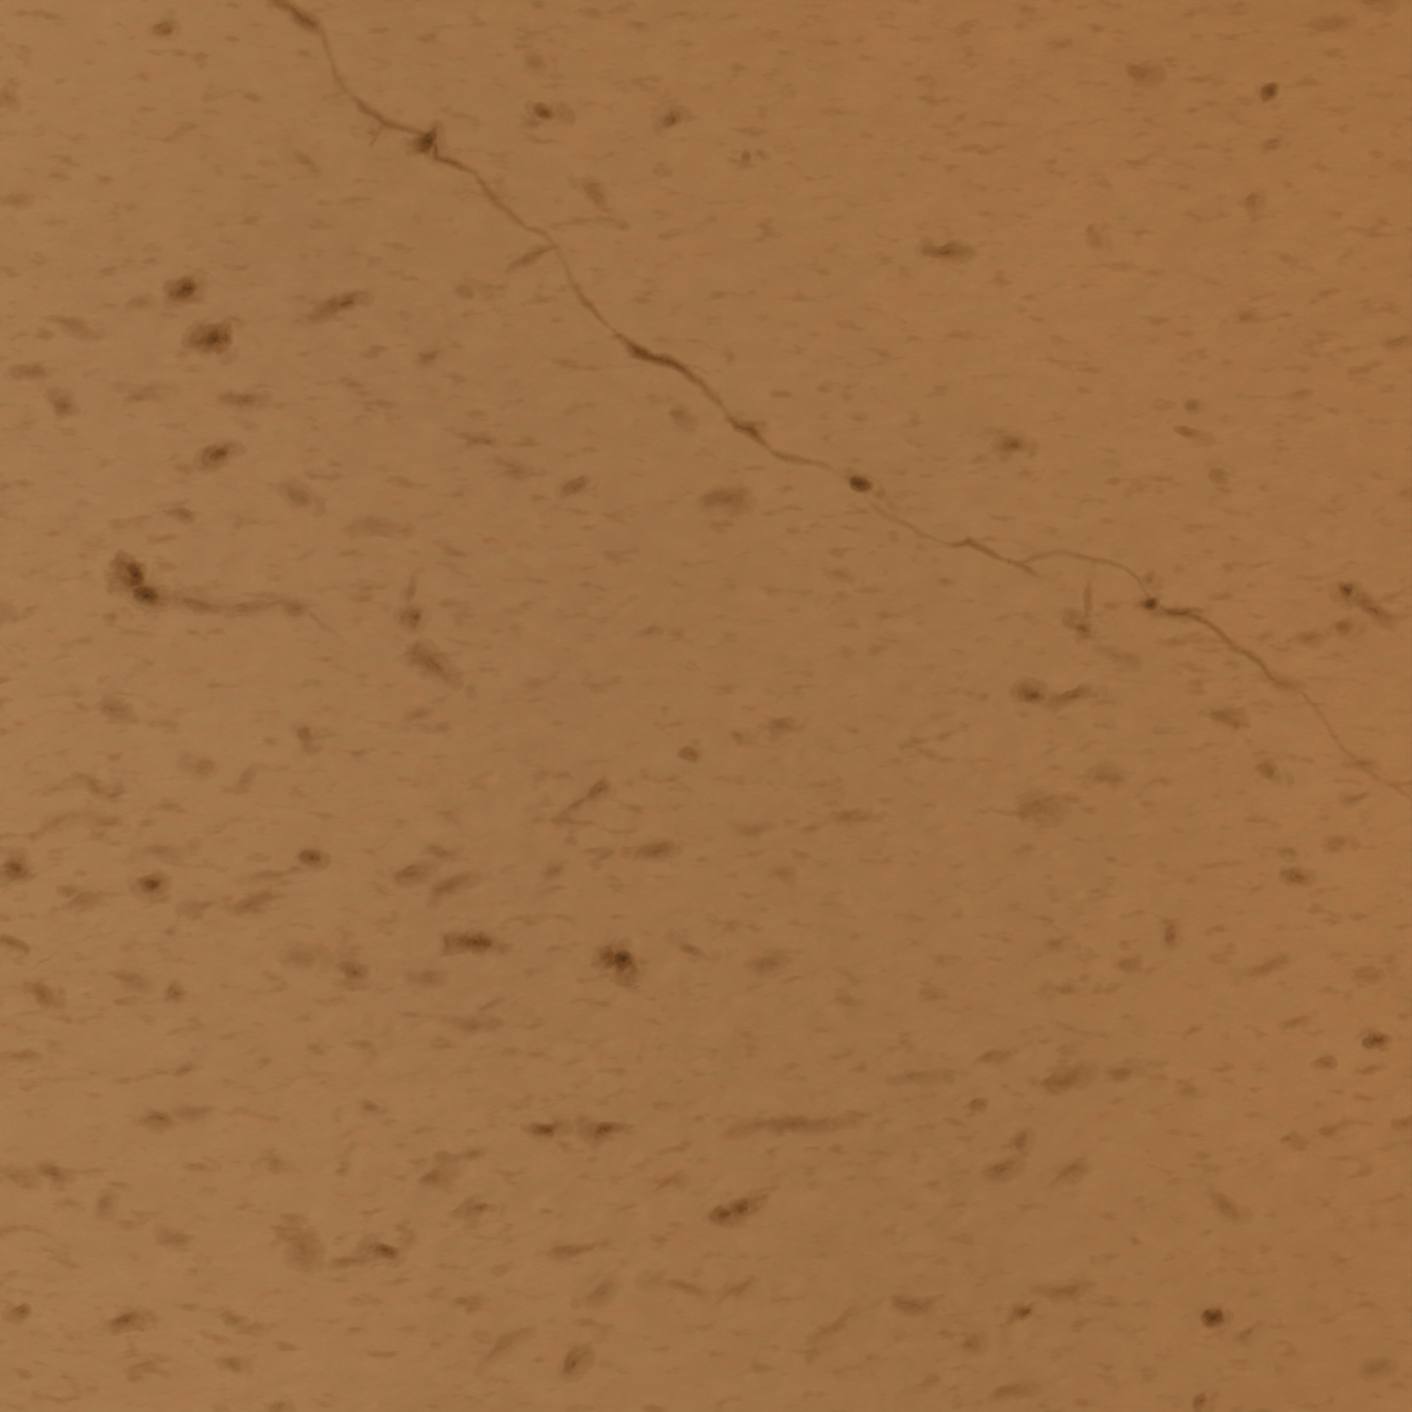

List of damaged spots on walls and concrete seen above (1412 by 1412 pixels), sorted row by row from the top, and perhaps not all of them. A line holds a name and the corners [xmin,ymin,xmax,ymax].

crack [258,0,1412,809]